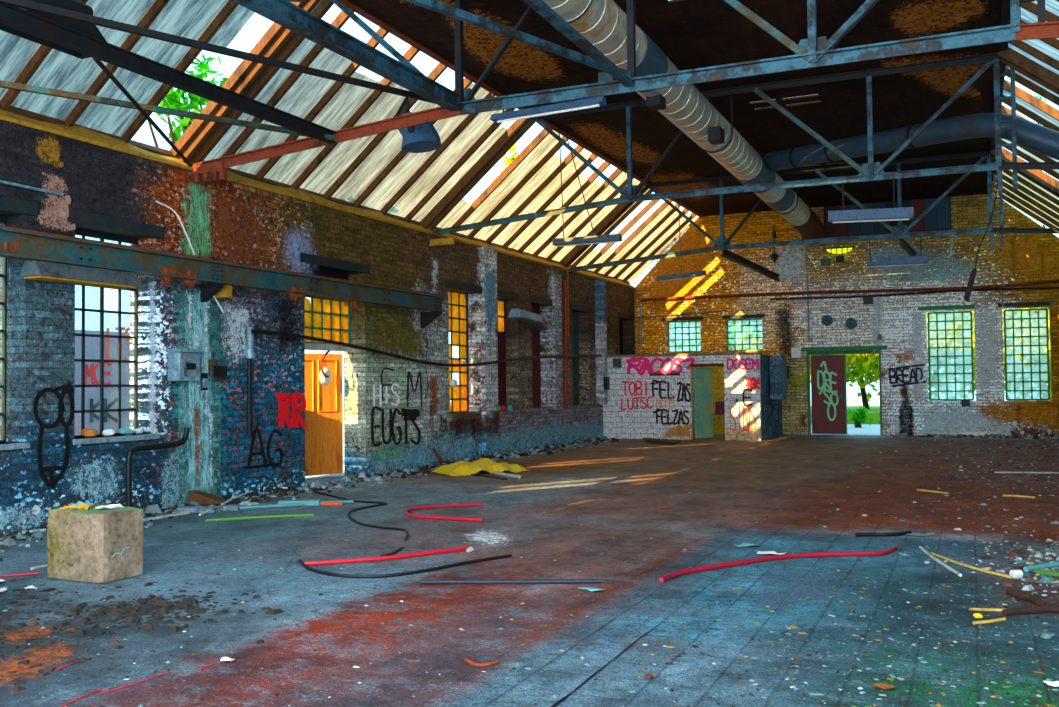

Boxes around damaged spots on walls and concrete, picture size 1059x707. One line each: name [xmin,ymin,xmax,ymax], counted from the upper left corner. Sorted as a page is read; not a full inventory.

flaking render [35,136,76,231]
peeling [147,281,158,434]